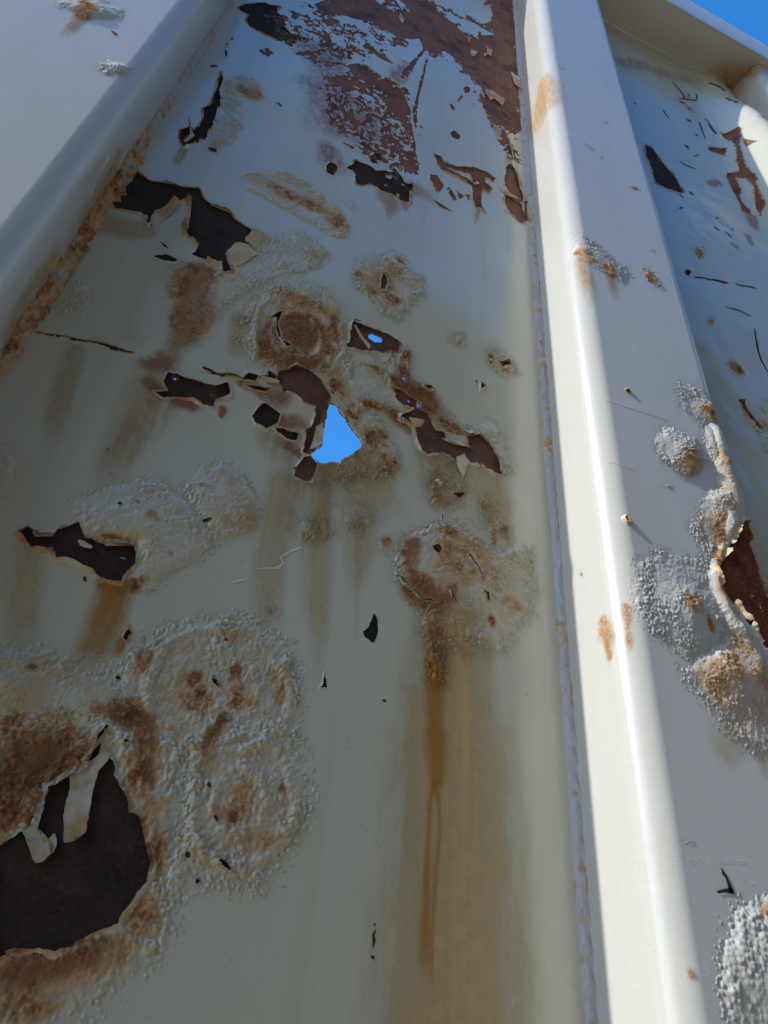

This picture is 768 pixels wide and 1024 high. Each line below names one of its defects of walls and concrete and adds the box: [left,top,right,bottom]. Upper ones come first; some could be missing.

peeling [236,0,529,226]
peeling [642,144,685,194]
peeling [110,170,272,275]
peeling [346,318,402,365]
peeling [486,354,514,370]
peeling [151,363,332,483]
peeling [389,383,505,478]
peeling [12,517,141,586]
rust [599,603,631,661]
peeling [713,515,768,652]
rust [389,537,509,1024]
peeling [0,718,158,960]